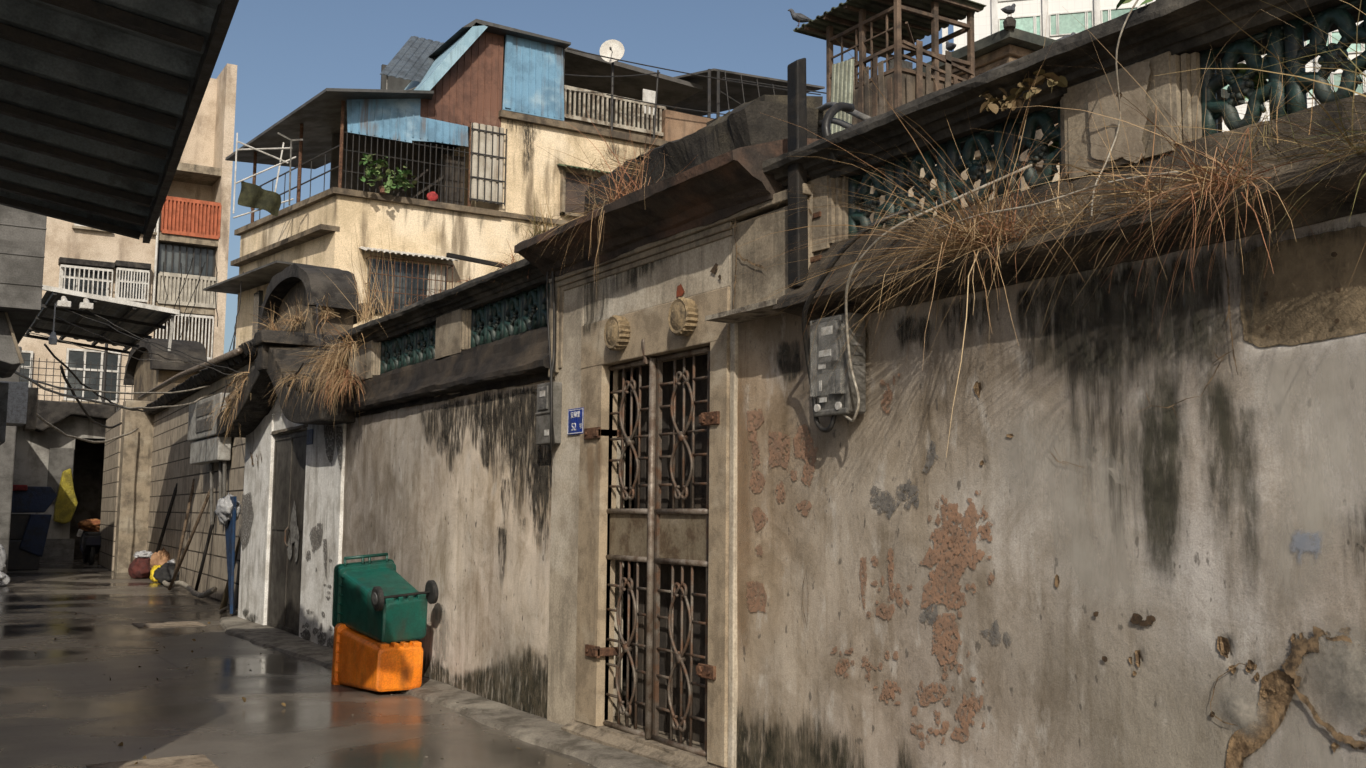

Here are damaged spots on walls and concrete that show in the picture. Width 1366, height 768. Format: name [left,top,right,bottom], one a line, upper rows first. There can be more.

water stain [898,299,989,348]
water stain [1016,252,1223,462]
water stain [421,388,552,538]
water stain [498,528,506,576]
flaking render [747,408,818,557]
flaking render [830,441,995,749]
peeling [981,620,1011,647]
water stain [1140,378,1178,555]
water stain [1210,383,1256,545]
flaking render [1217,636,1295,768]